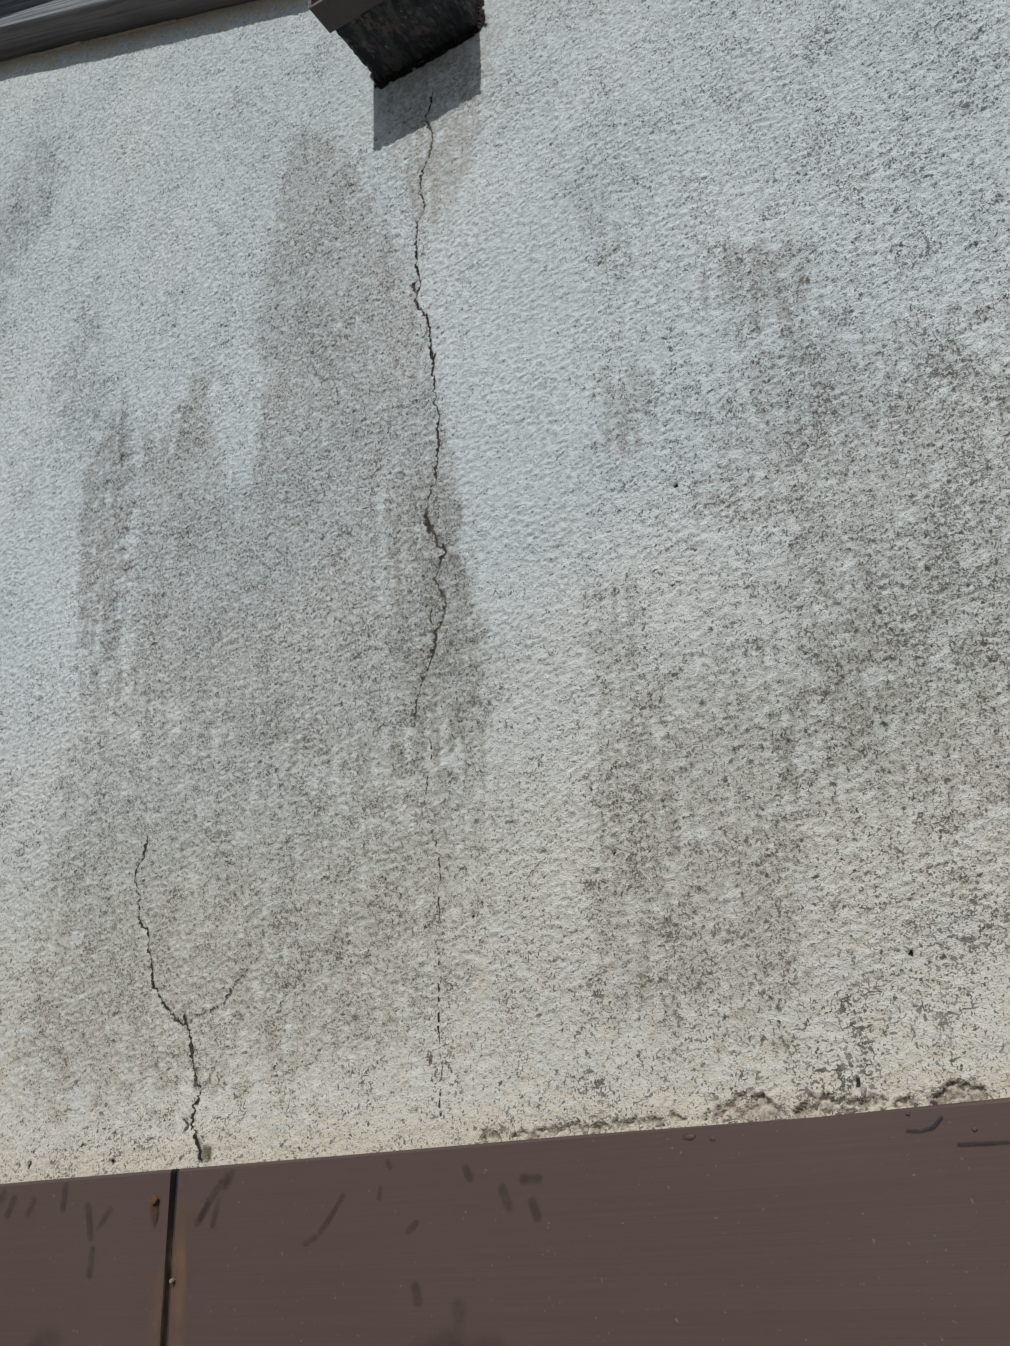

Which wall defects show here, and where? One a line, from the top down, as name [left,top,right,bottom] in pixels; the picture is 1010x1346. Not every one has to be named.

leakage [564,184,634,284]
crack [411,92,447,804]
leakage [13,132,515,1123]
leakage [583,227,1010,1049]
crack [134,836,259,1161]
crack [434,837,442,920]
crack [436,959,444,1108]